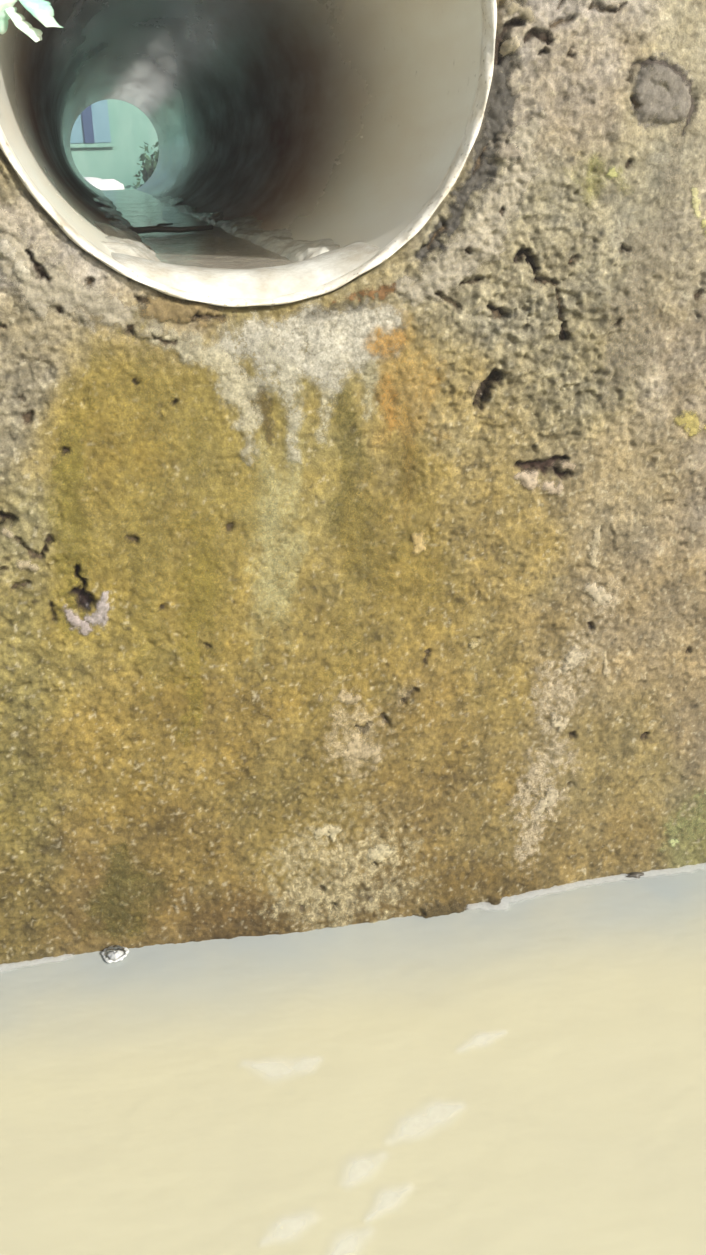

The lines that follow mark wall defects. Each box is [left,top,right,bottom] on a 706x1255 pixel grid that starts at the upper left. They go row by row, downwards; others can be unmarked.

water stain [151,303,402,617]
corrosion [366,310,441,522]
spalling [514,456,576,495]
spalling [50,564,110,636]